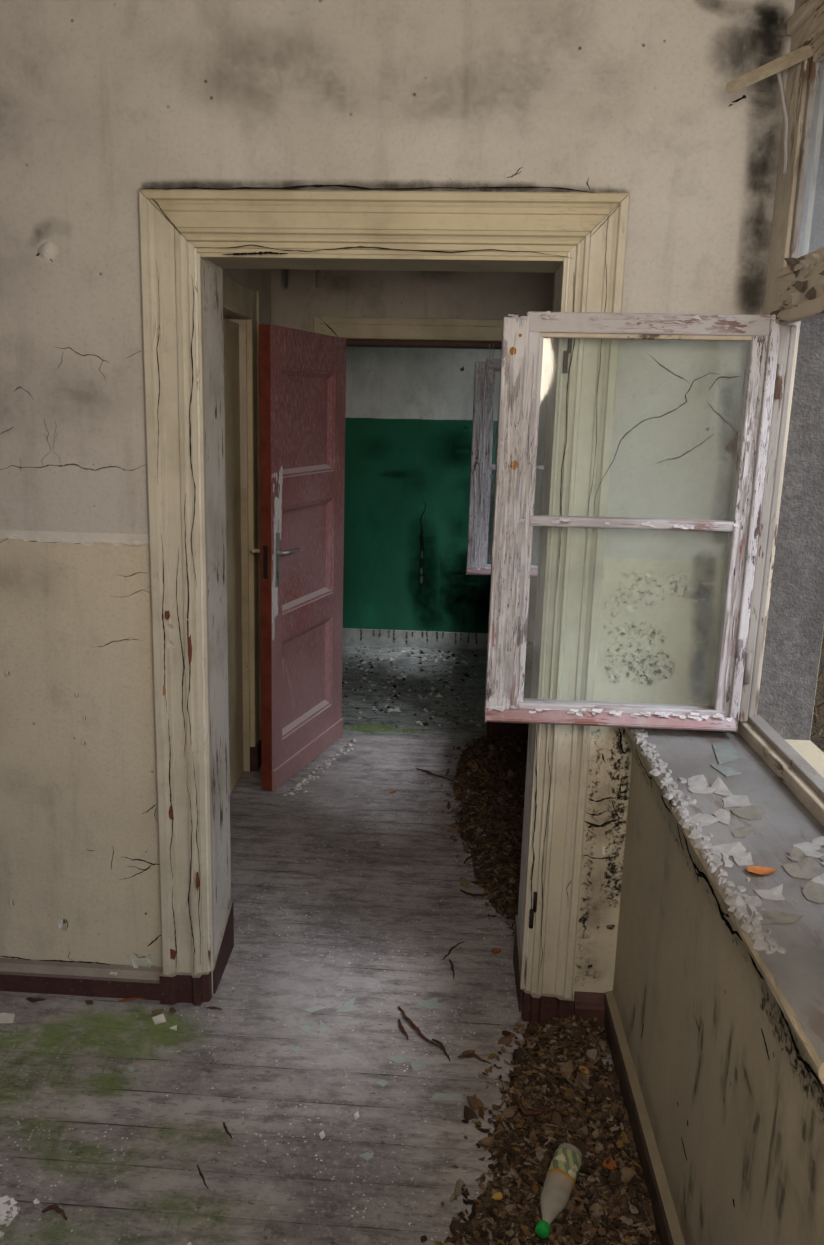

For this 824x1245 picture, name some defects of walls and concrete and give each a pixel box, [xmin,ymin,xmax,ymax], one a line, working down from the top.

damp [731,7,787,111]
damp [740,129,775,313]
crack [1,167,626,969]
damp [360,495,494,645]
peeling [567,336,824,954]
damp [579,731,648,938]
crack [531,726,824,1108]
damp [762,989,824,1138]